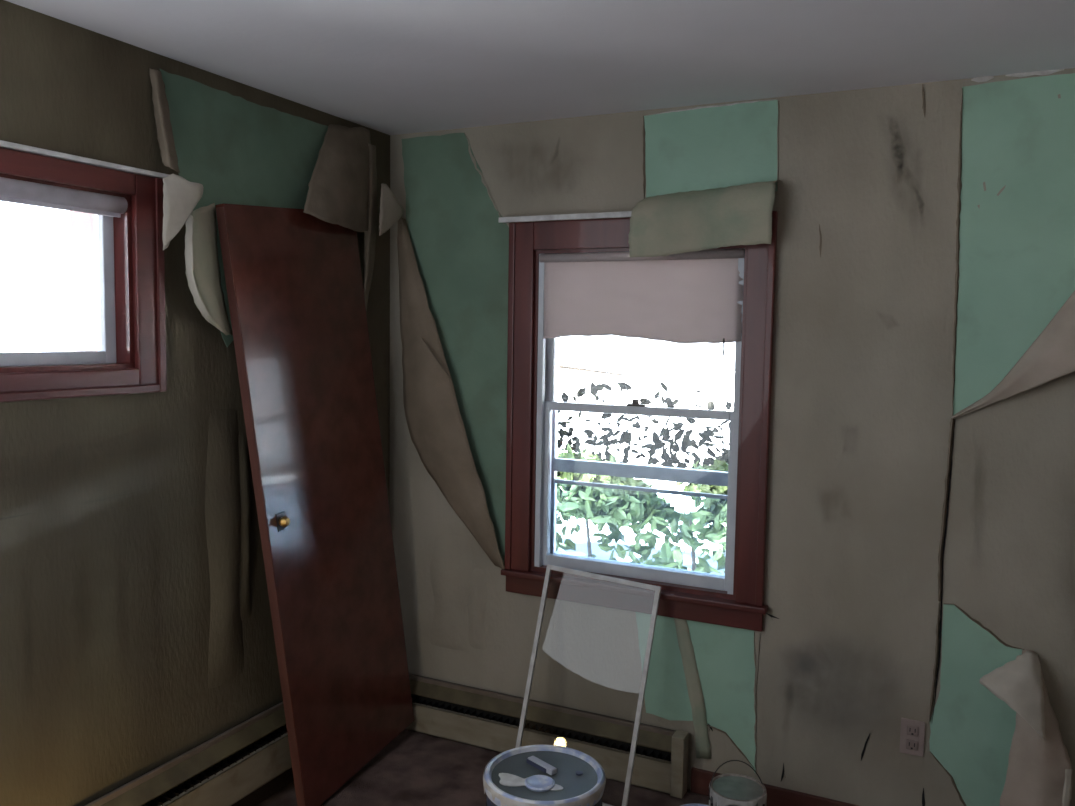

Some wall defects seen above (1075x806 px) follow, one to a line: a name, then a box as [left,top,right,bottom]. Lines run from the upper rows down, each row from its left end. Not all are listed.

flaking render [160,69,328,347]
flaking render [401,133,509,568]
flaking render [953,69,1075,415]
flaking render [636,612,756,772]
flaking render [929,604,1022,806]